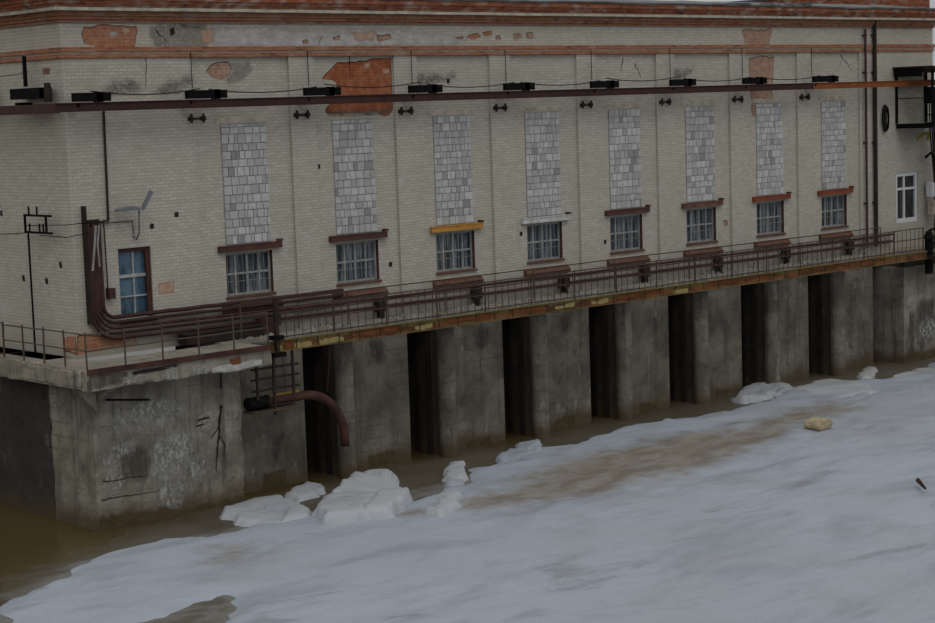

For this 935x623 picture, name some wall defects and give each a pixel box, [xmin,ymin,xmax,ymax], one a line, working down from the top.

spalling [82,24,138,47]
spalling [323,58,393,116]
spalling [742,27,774,116]
damp [100,397,244,531]